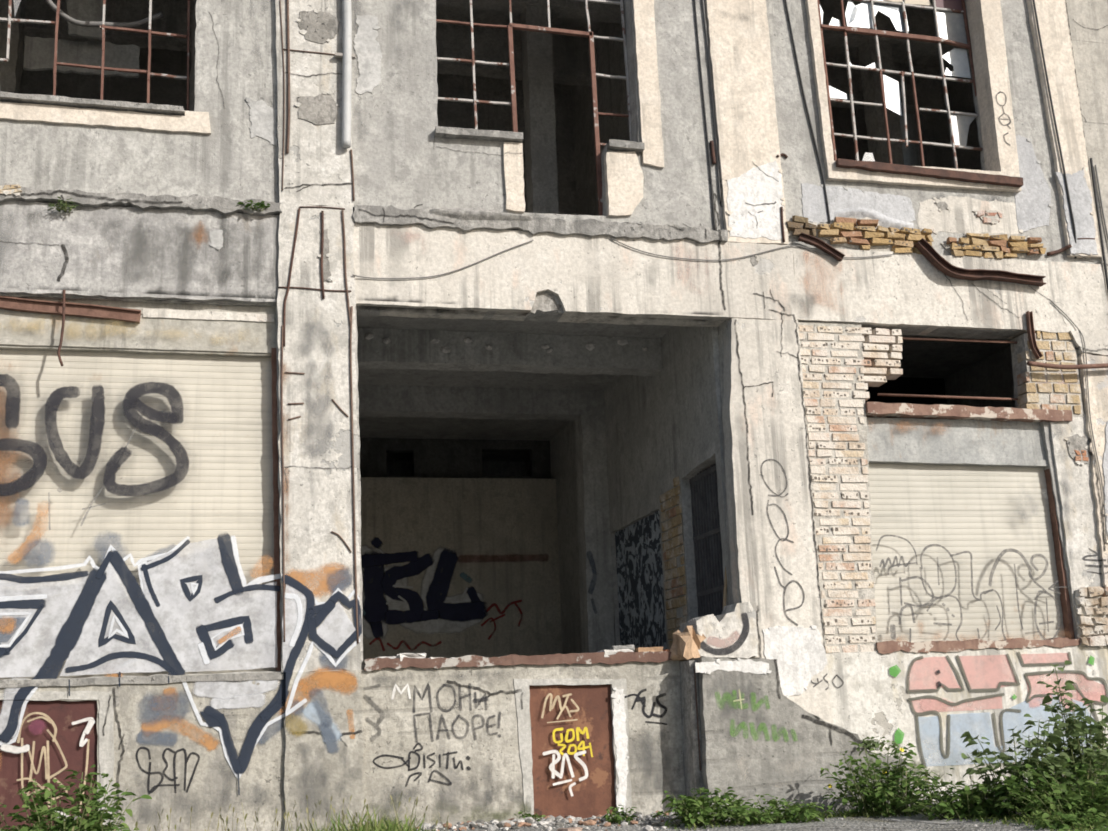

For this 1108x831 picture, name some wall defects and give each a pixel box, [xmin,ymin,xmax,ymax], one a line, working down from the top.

spalling [296,9,340,44]
peeling [353,14,382,95]
spalling [294,90,340,125]
peeling [726,135,1098,259]
rust [0,296,141,324]
rust [279,149,359,643]
crack [672,161,825,649]
spalling [1065,421,1108,543]
flaking render [1074,586,1108,648]
peeling [695,625,827,698]